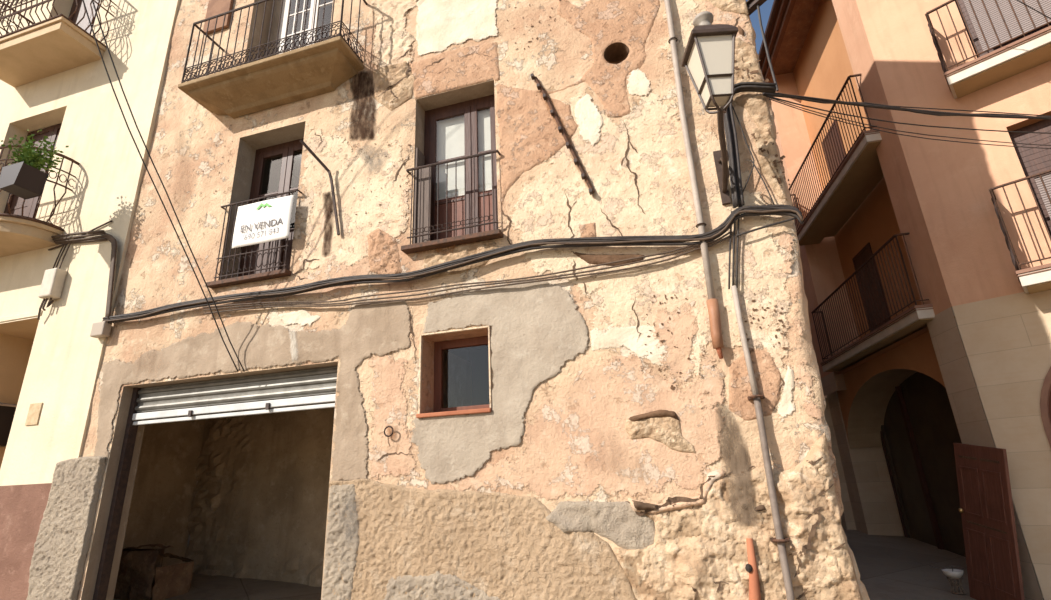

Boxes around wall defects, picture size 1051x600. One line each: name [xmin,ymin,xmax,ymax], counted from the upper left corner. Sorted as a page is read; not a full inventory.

spalling [707,0,749,14]
flaking render [373,0,660,205]
crack [565,194,586,293]
crack [621,121,644,213]
flaking render [625,299,785,464]
spalling [612,430,863,600]